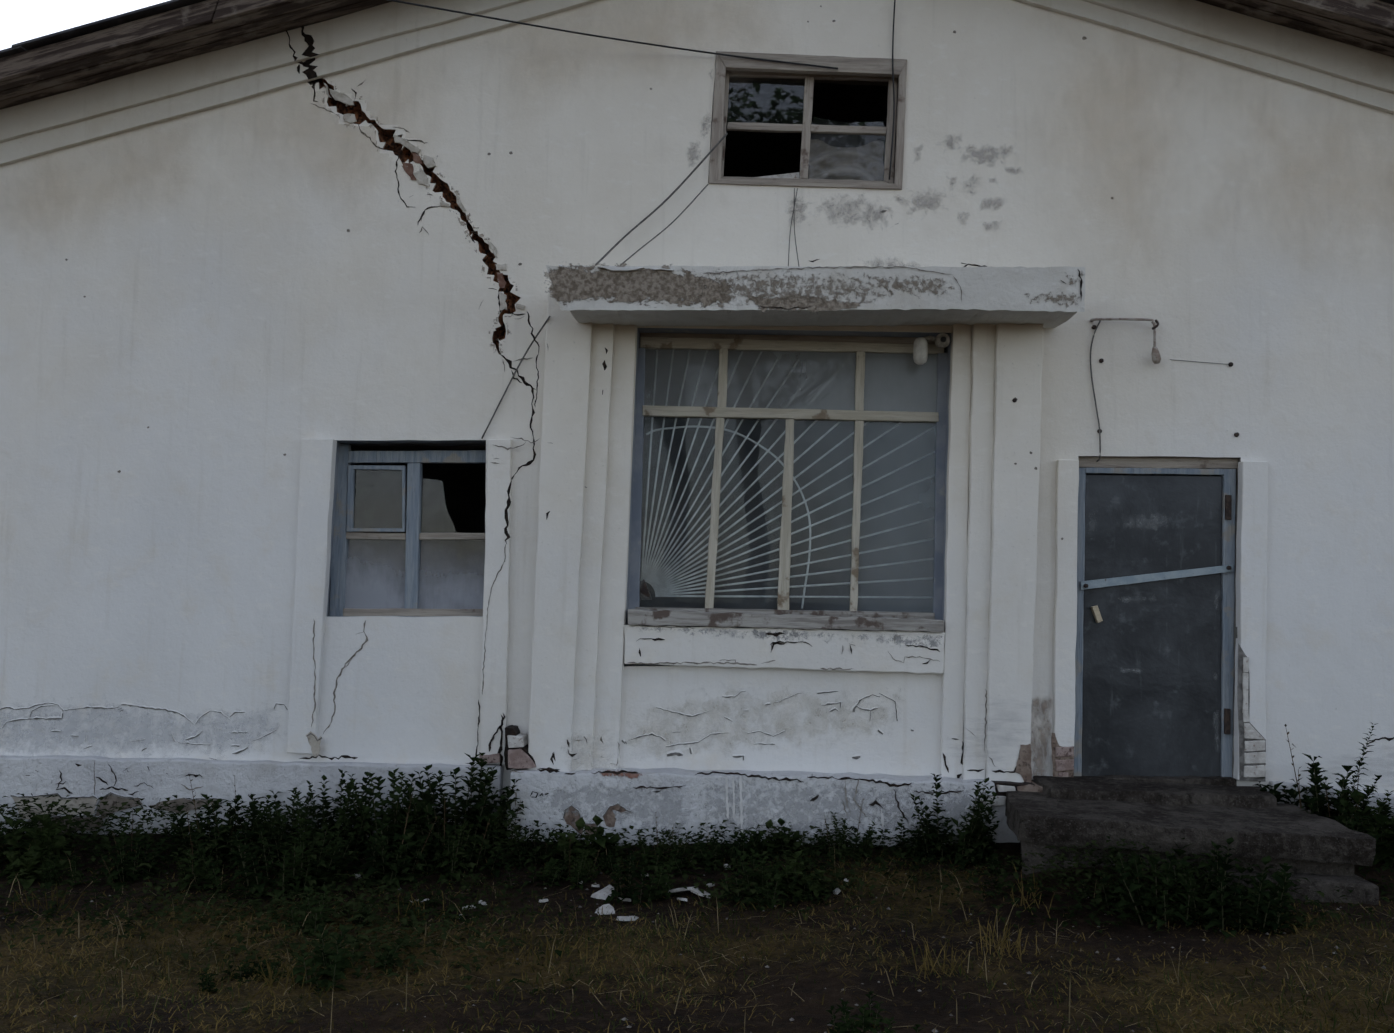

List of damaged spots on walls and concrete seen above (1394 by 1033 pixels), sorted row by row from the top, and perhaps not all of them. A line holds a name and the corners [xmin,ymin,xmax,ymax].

spalling [544,263,954,312]
peeling [1025,273,1083,307]
crack [286,26,548,695]
peeling [0,702,276,766]
crack [299,621,368,760]
spalling [980,733,1074,807]
flaking render [1237,644,1266,782]